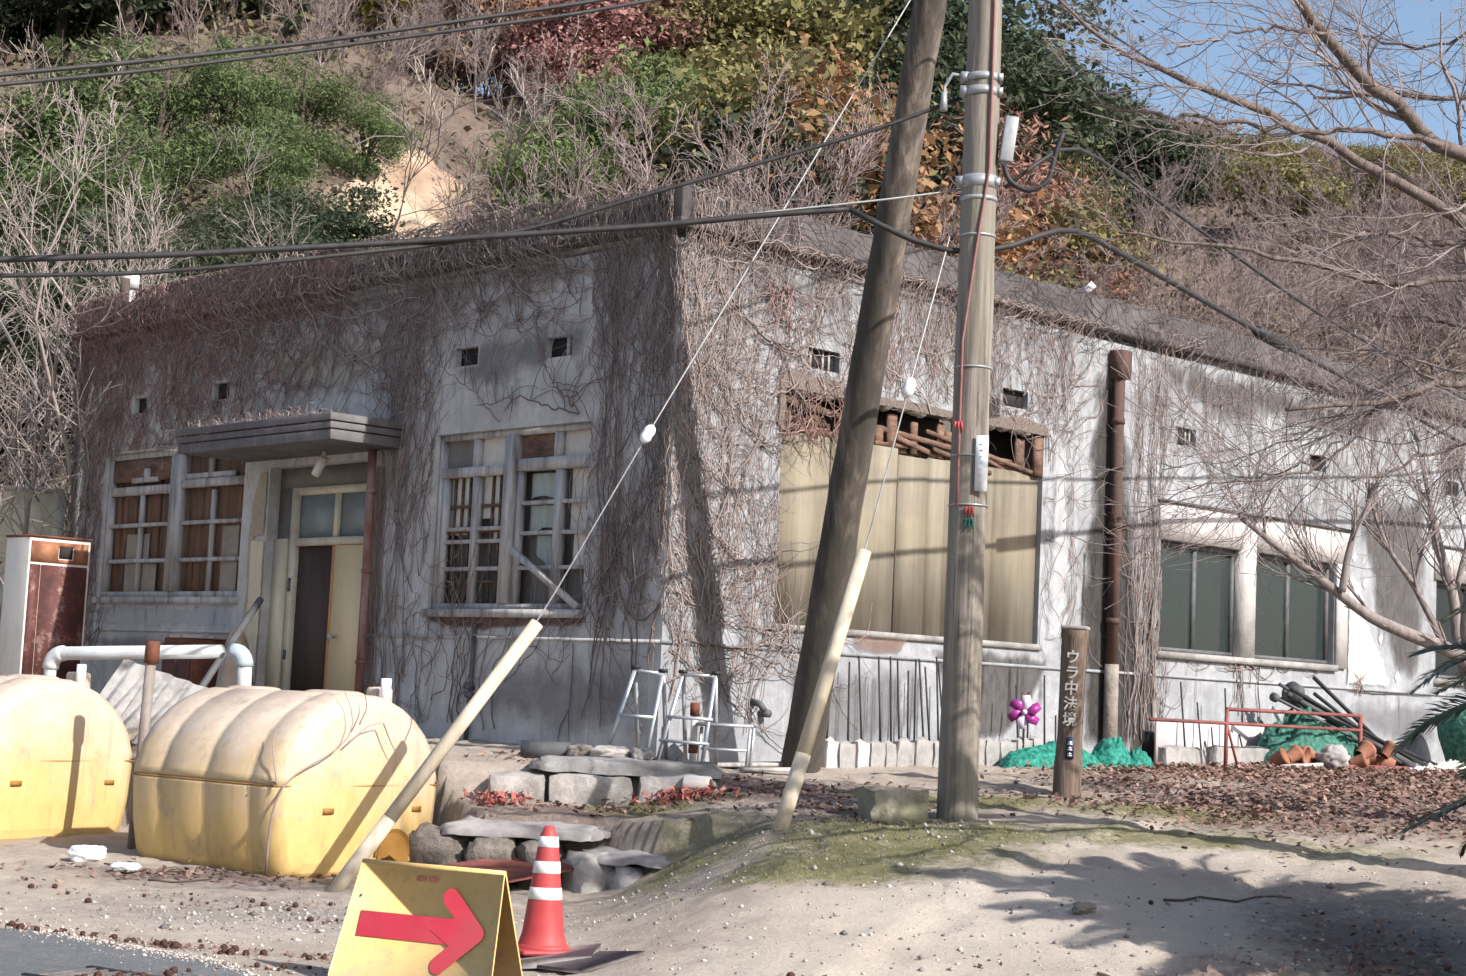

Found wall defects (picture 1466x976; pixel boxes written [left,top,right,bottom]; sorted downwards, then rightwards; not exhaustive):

damp [1171,370,1385,434]